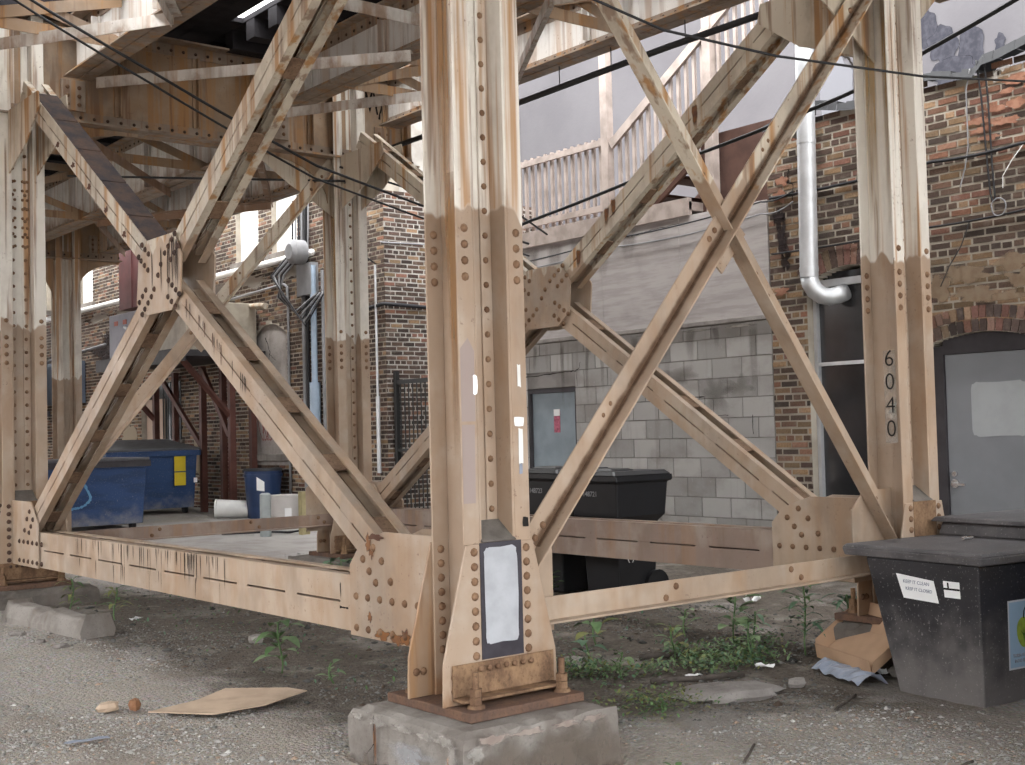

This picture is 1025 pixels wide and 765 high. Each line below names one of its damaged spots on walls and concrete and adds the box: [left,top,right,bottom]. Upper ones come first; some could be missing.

rust [365,533,383,559]
rust [368,612,411,646]